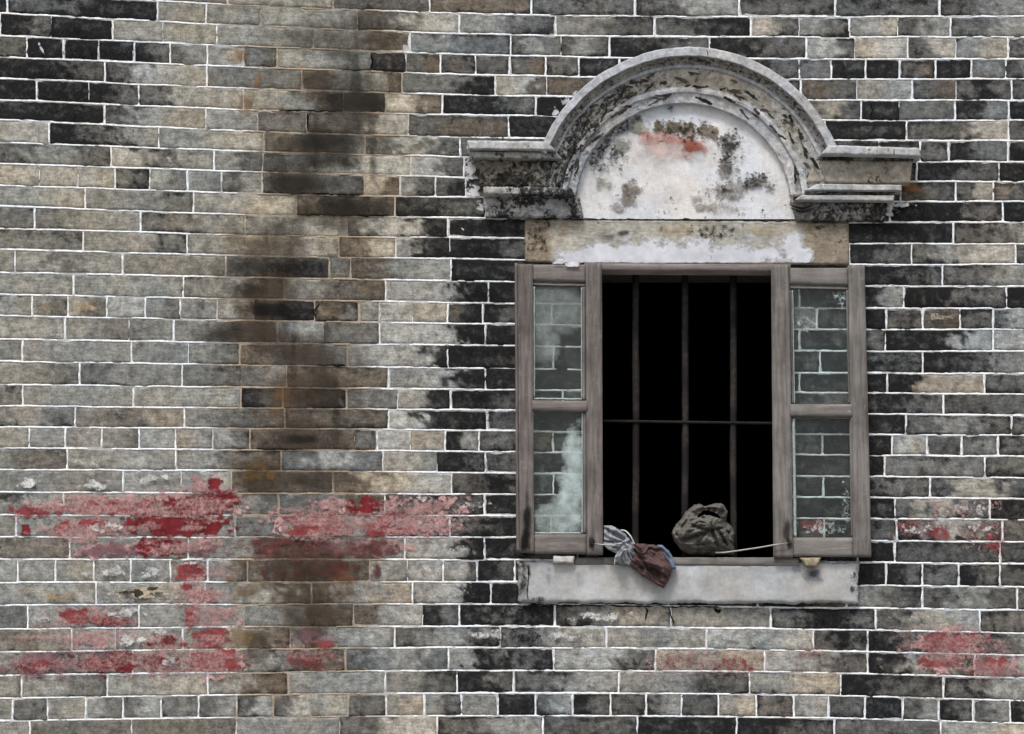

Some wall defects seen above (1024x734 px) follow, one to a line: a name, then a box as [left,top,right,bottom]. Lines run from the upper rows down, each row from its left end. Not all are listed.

peeling [562,71,820,184]
water stain [271,126,354,193]
water stain [589,106,776,241]
peeling [743,171,775,190]
water stain [449,272,510,307]
water stain [871,267,953,306]
water stain [215,226,338,407]
water stain [453,330,498,372]
water stain [452,385,509,428]
water stain [280,419,318,453]
water stain [441,502,500,552]
spalling [108,585,178,599]